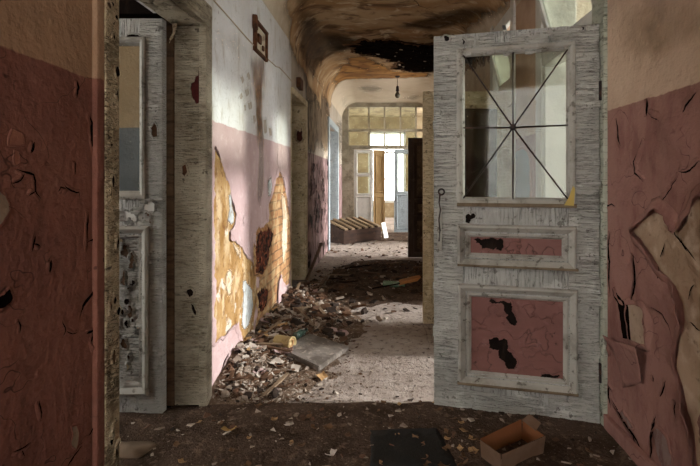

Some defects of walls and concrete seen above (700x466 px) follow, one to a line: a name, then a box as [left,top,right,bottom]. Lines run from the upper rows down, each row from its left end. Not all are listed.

crack [86,113,94,155]
crack [644,99,660,121]
crack [682,89,696,112]
crack [10,169,41,202]
crack [58,161,93,251]
crack [660,156,699,200]
peeling [212,146,292,347]
crack [607,231,636,306]
crack [62,292,94,357]
peeling [616,293,653,352]
peeling [629,183,700,466]
crack [607,374,676,457]